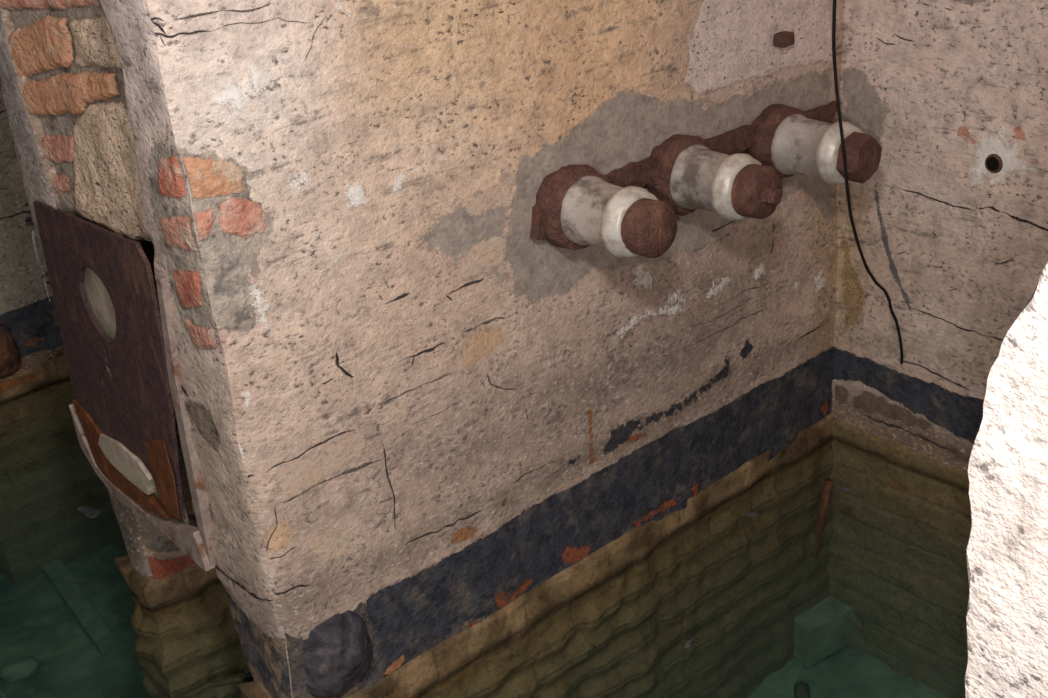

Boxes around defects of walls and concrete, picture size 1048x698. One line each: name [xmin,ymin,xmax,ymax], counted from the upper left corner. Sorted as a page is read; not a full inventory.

crack [150,3,324,60]
spalling [0,0,320,354]
crack [896,187,1048,231]
crack [446,279,484,301]
crack [322,352,353,384]
crack [381,317,507,404]
crack [487,373,528,419]
damp [602,338,753,456]
corrosion [72,399,180,519]
crack [248,430,355,478]
crack [266,444,482,559]
crack [215,564,309,601]